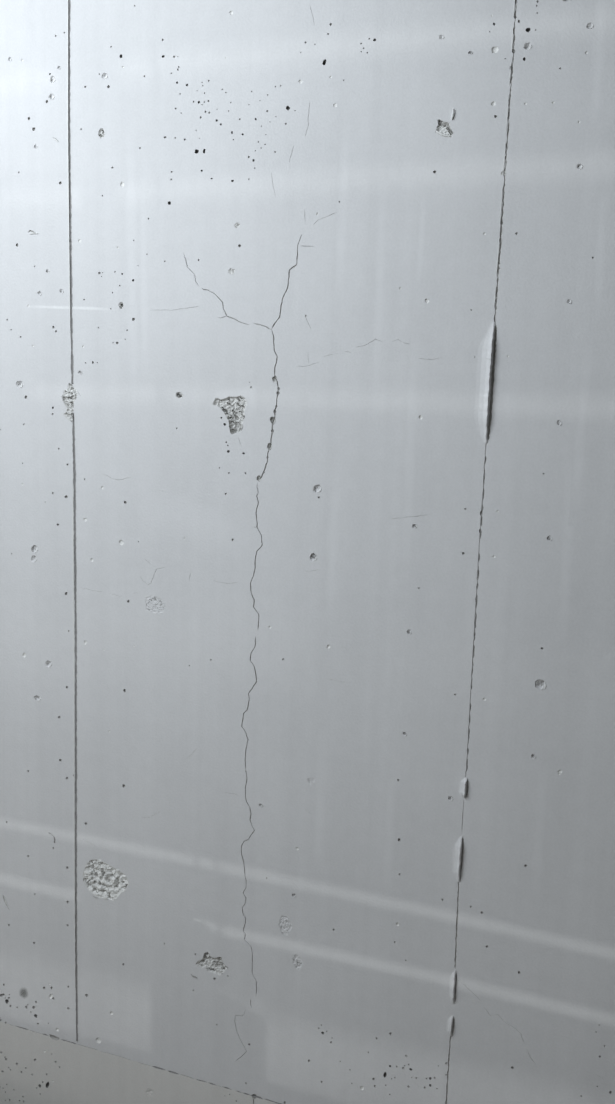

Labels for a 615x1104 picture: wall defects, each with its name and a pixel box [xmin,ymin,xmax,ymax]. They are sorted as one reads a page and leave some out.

spalling [212,382,252,454]
crack [155,212,438,1061]
spalling [83,859,129,901]
spalling [191,952,229,992]